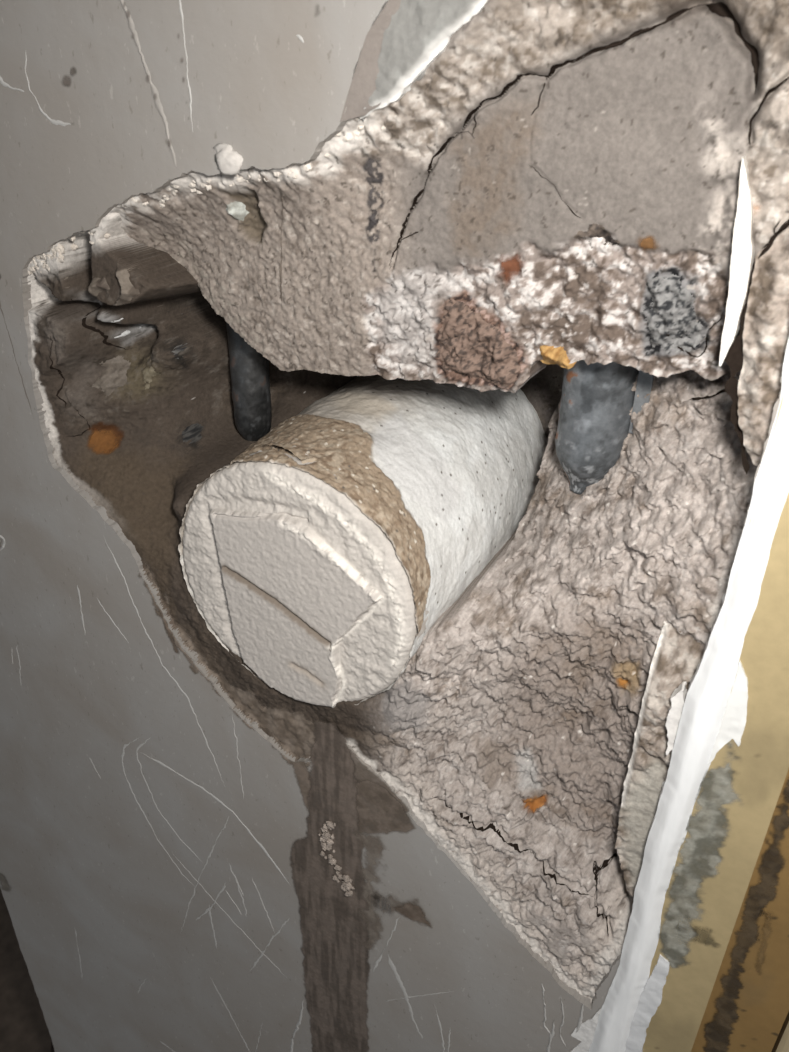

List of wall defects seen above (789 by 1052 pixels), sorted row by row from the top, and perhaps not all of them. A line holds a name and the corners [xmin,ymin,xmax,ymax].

peeling [340,0,488,122]
crack [389,2,789,268]
crack [71,299,132,350]
crack [50,336,90,437]
corrosion [88,423,123,454]
spalling [27,156,789,1002]
water stain [139,562,431,1052]
crack [428,796,617,935]
corrosion [521,795,546,813]